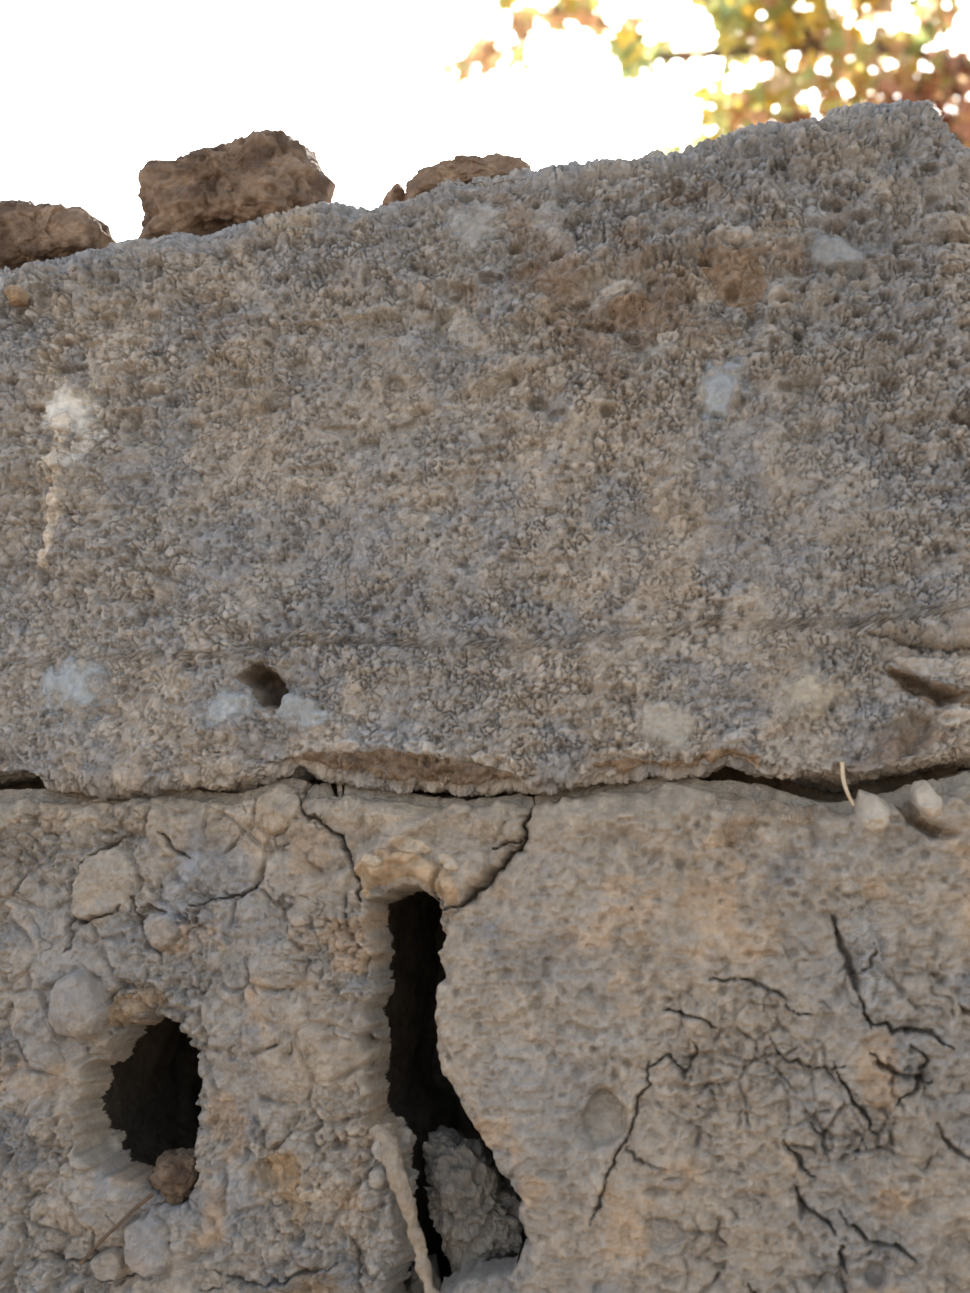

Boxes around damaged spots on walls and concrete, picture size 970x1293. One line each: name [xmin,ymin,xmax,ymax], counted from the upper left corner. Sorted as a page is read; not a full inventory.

crack [0,781,72,823]
crack [90,830,191,859]
crack [294,781,361,904]
crack [414,789,452,797]
crack [442,805,535,916]
crack [699,766,957,803]
crack [66,865,266,955]
crack [708,914,953,1138]
crack [591,1005,718,1225]
crack [936,1120,969,1160]
crack [780,1121,915,1274]